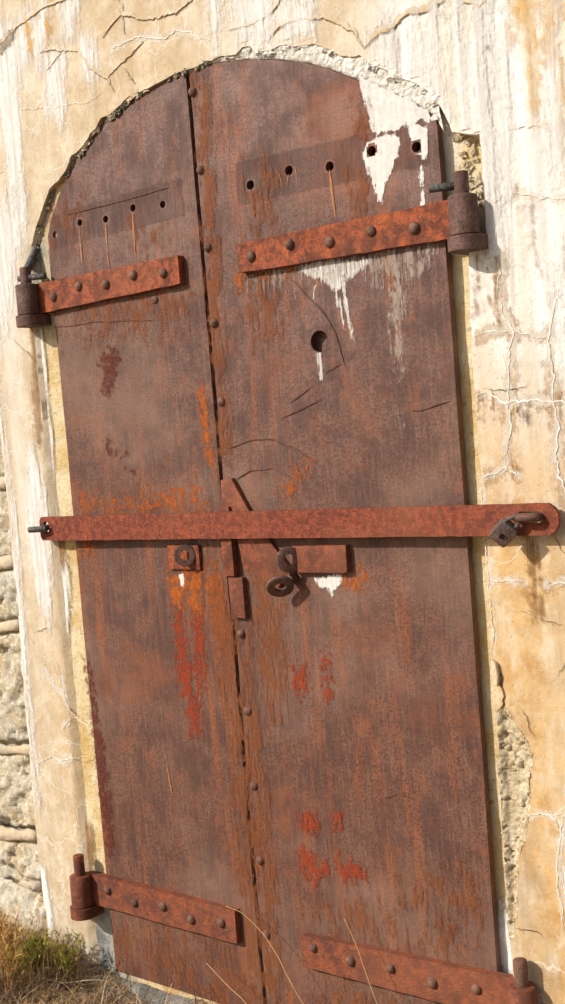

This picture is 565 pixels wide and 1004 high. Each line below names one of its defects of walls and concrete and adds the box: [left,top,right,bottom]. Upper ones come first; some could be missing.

crack [0,0,65,45]
crack [23,0,486,110]
water stain [207,0,317,56]
spalling [165,41,485,208]
water stain [364,0,515,236]
crack [473,254,565,505]
spalling [491,659,500,687]
crack [484,535,565,738]
spalling [496,707,533,940]
water stain [555,817,565,928]